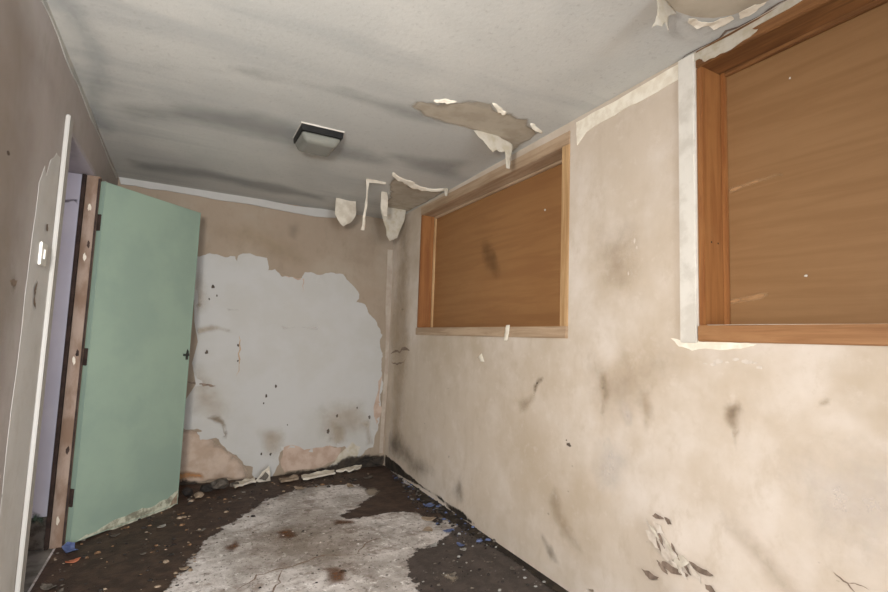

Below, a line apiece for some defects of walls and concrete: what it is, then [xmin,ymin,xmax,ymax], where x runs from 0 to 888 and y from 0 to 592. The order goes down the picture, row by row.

peeling [179,250,393,482]
spalling [642,513,715,592]